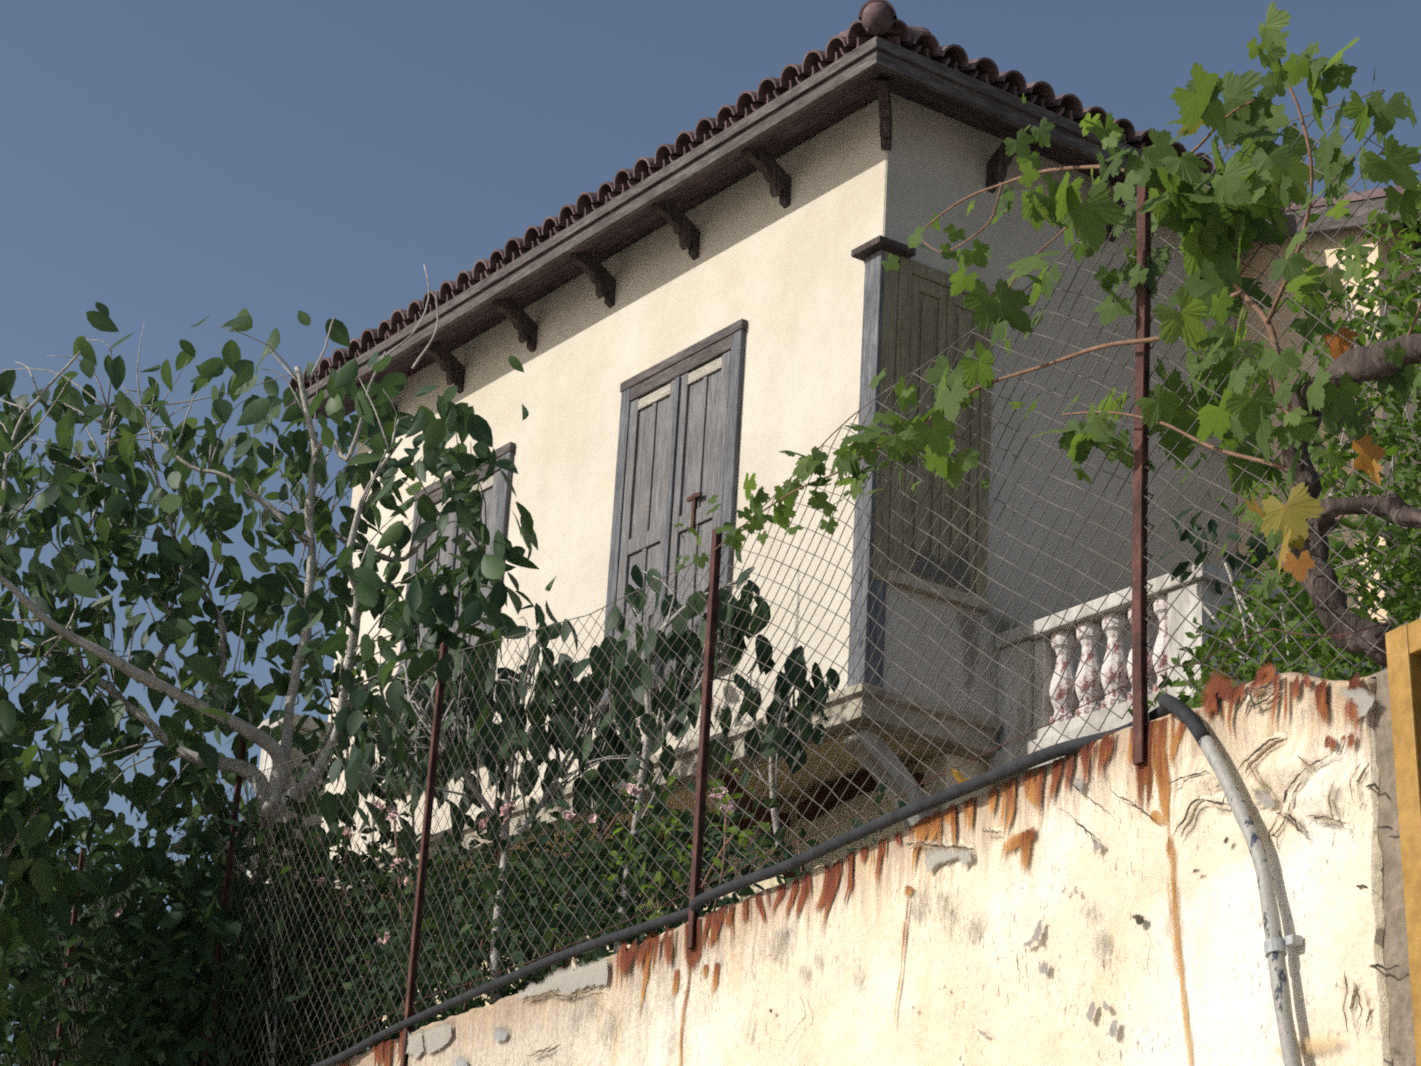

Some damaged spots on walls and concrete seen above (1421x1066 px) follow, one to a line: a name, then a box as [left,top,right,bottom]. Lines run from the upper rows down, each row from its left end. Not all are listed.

crack [1058,677,1393,858]
rust [616,664,1364,1066]
rust [373,1030,403,1066]